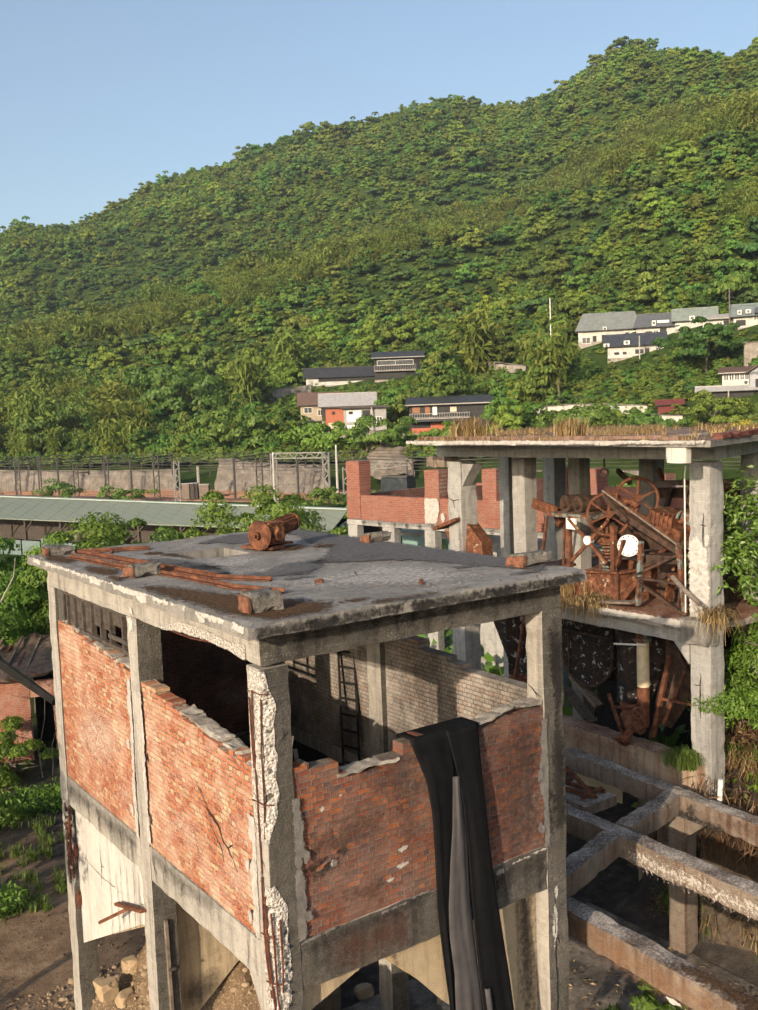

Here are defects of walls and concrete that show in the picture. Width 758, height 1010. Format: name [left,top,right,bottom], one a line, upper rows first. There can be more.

spalling [33,558,293,1010]
crack [196,783,237,871]